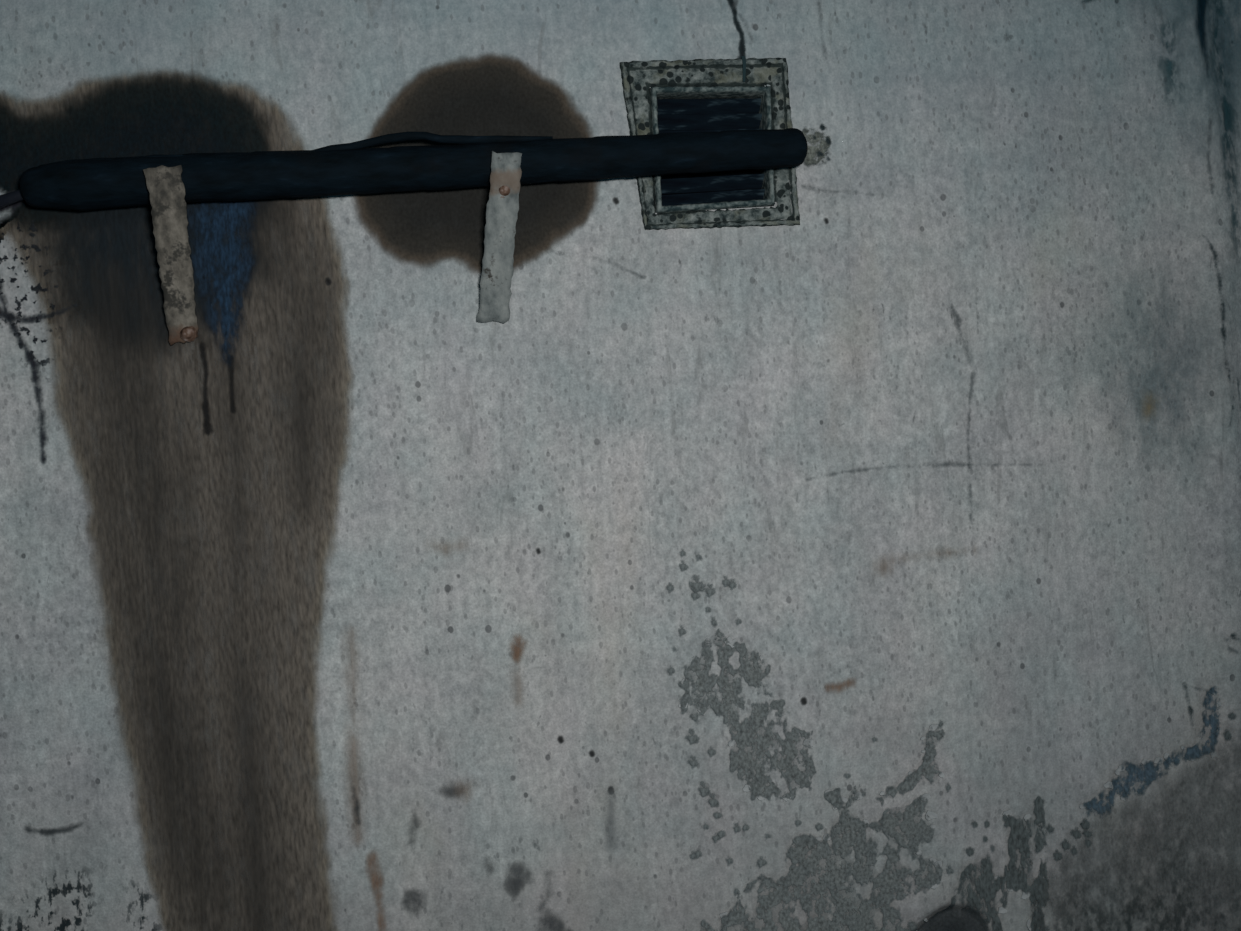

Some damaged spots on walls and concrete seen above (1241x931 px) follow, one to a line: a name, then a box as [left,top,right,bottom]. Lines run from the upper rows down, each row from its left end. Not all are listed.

crack [728,0,746,82]
water stain [366,56,591,148]
water stain [355,187,490,273]
water stain [513,180,597,268]
crack [0,191,77,463]
water stain [0,73,351,931]
peeling [668,549,1236,931]